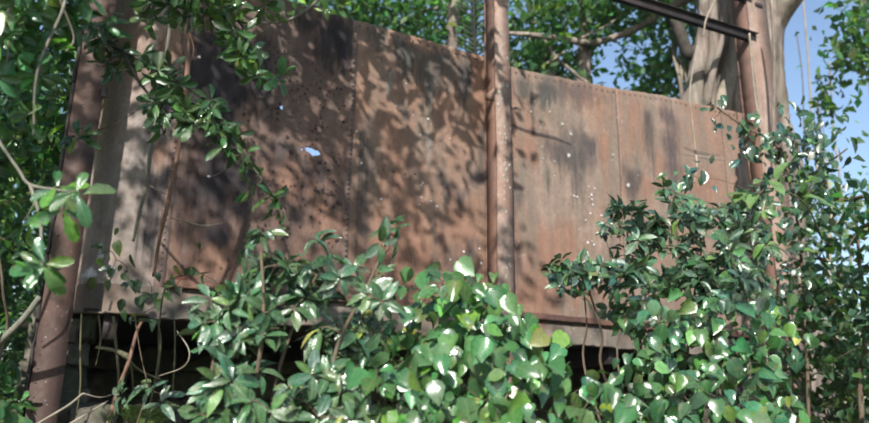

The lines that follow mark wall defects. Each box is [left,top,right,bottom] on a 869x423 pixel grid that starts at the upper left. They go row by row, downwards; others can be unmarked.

spalling [237,31,351,242]